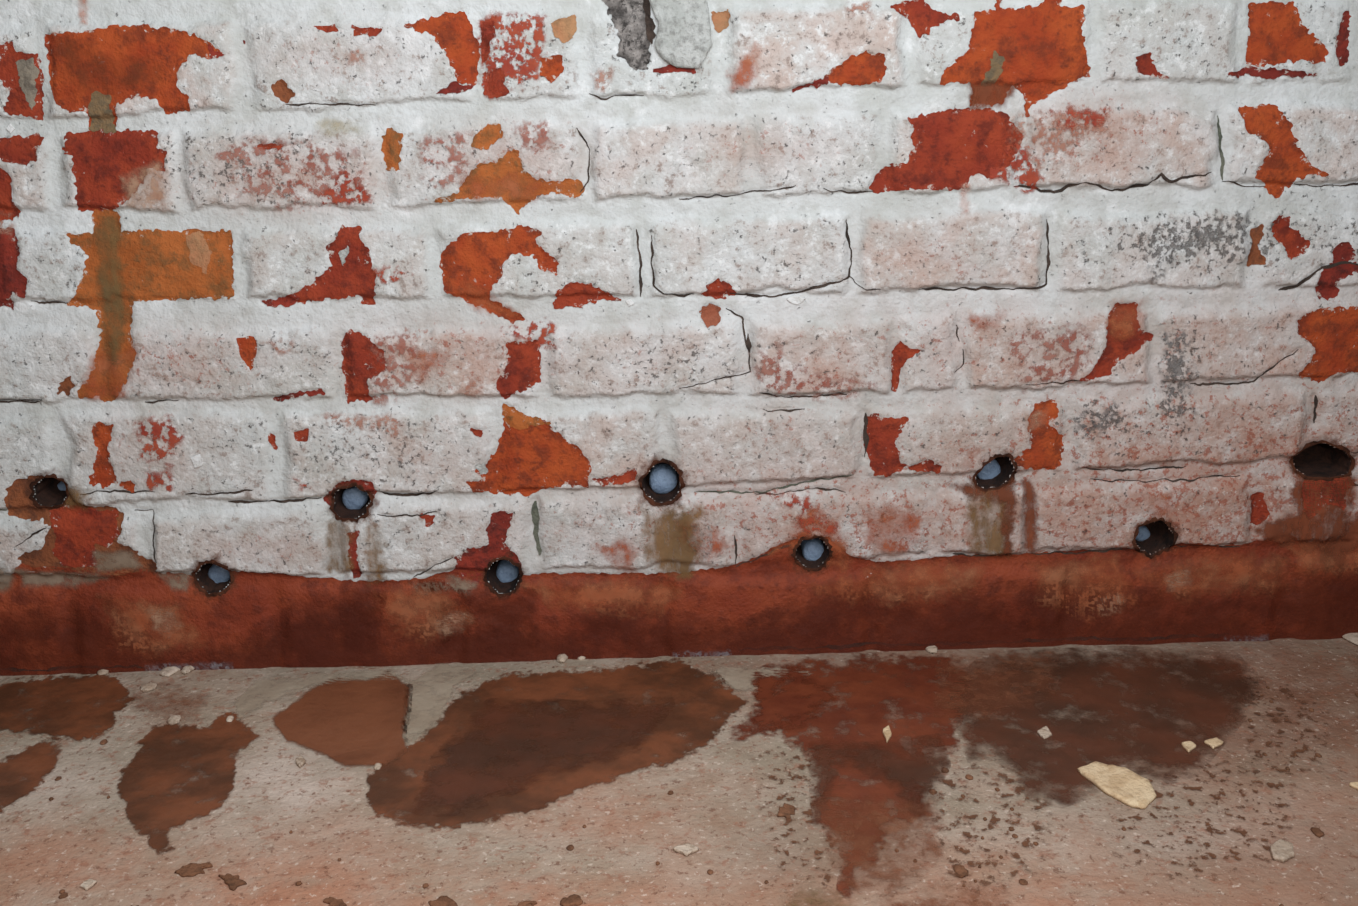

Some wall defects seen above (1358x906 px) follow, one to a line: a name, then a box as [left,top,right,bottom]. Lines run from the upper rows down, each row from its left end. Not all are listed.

peeling [869,0,1108,194]
peeling [1228,1,1351,79]
peeling [0,0,235,402]
peeling [262,224,404,307]
peeling [422,122,685,506]
crack [636,229,693,297]
crack [679,185,881,495]
crack [919,116,1358,291]
crack [1190,349,1299,386]
water stain [602,508,702,578]
peeling [0,413,1358,676]
crack [1087,466,1240,483]